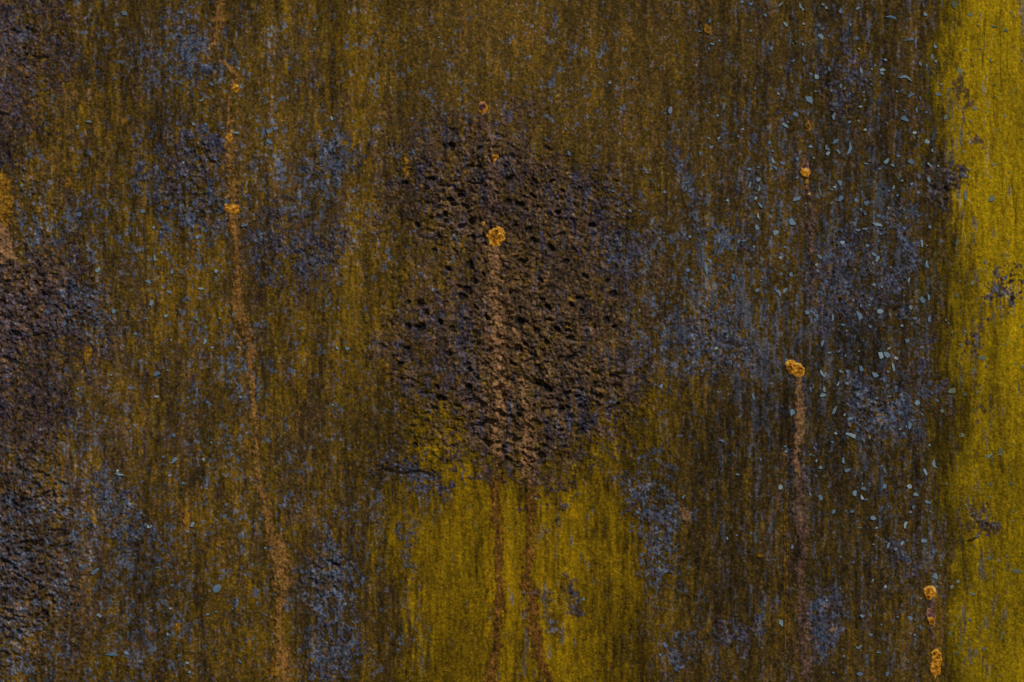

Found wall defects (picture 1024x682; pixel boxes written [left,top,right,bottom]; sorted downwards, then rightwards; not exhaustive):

corrosion [134,0,766,682]
peeling [747,141,799,230]
corrosion [781,360,850,682]
corrosion [885,530,942,678]